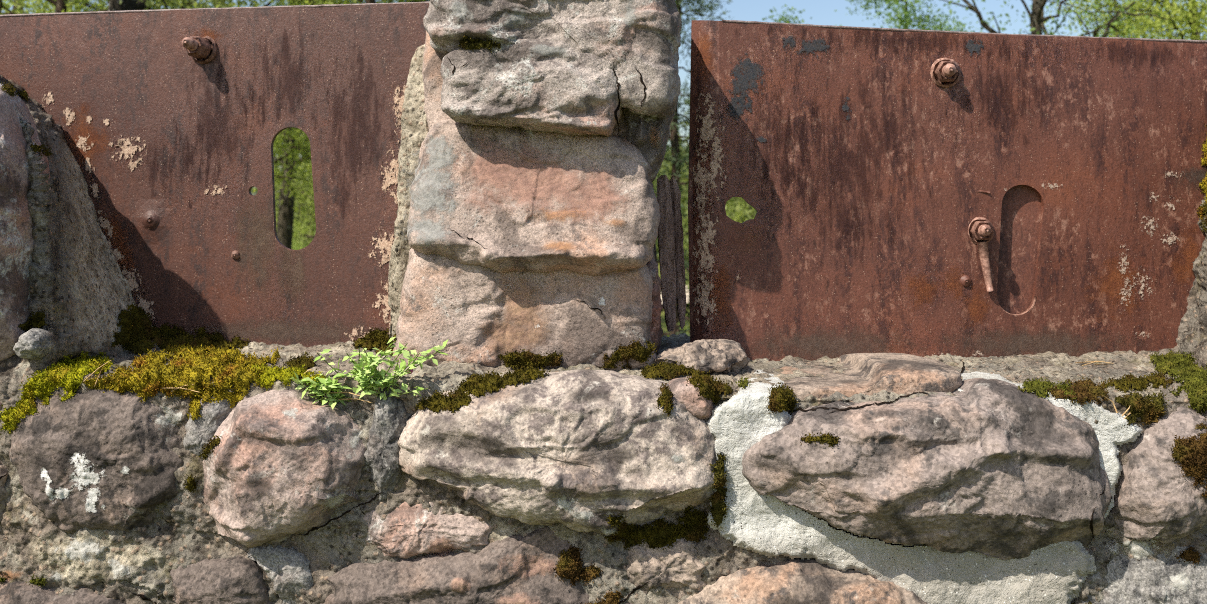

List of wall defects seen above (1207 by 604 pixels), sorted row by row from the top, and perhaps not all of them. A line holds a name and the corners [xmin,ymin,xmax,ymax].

rust [71,109,104,161]
peeling [41,88,155,320]
peeling [381,87,405,204]
crack [613,62,646,131]
peeling [690,50,764,324]
peeling [782,33,830,57]
peeling [344,228,394,341]
crack [788,392,929,414]